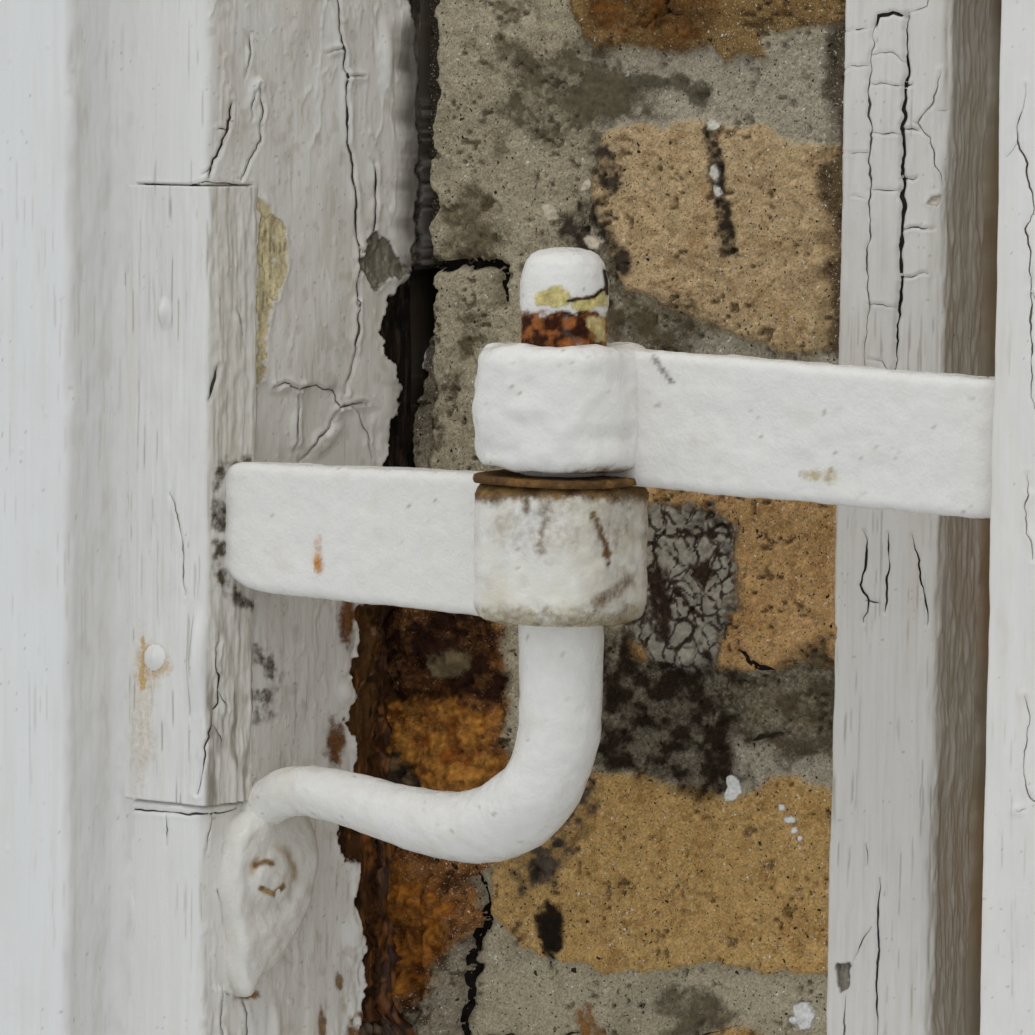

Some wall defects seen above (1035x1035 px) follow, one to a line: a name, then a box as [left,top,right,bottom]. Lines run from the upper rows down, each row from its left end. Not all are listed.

crack [145,38,264,186]
peeling [256,198,287,384]
crack [276,0,377,461]
spalling [358,0,422,467]
corrosion [521,310,607,347]
crack [845,1,946,369]
crack [1010,88,1035,408]
corrosion [139,637,162,690]
corrosion [348,1012,363,1035]
corrosion [386,858,457,998]
corrosion [575,1005,606,1035]
crack [852,885,881,1034]